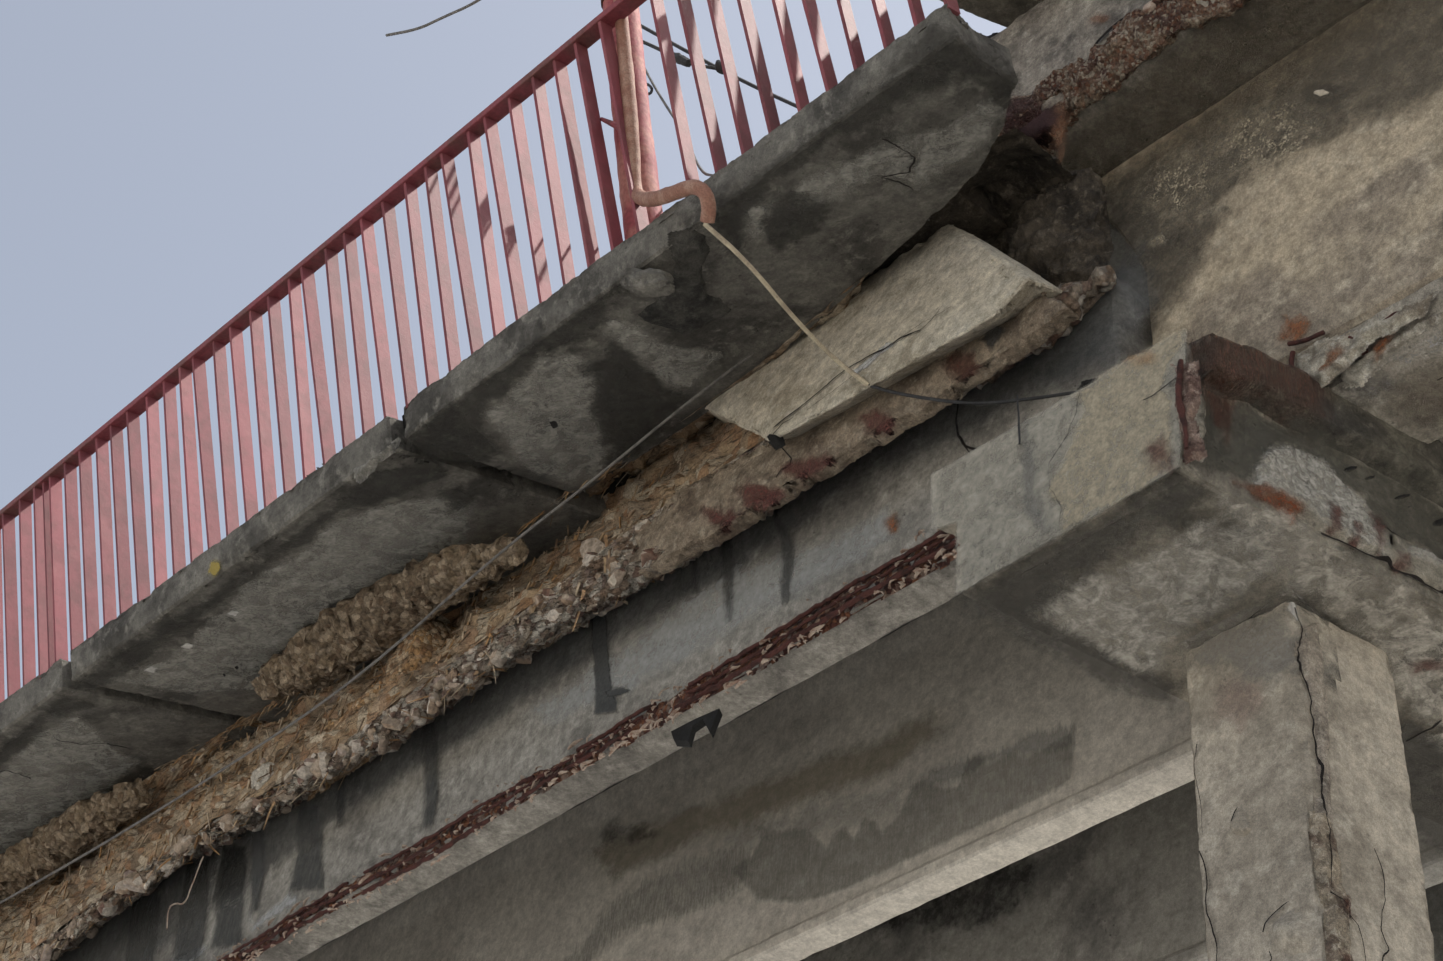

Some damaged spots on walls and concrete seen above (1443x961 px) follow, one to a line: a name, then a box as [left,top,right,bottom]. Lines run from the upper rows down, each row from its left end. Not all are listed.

damp [715,26,1020,253]
spalling [984,167,1114,287]
spalling [998,0,1251,156]
damp [1057,0,1443,316]
corrosion [1190,333,1338,428]
spalling [1287,290,1443,389]
damp [0,275,1144,961]
damp [931,331,1443,850]
corrosion [1249,485,1303,524]
crack [1321,532,1443,594]
corrosion [213,528,960,961]
crack [1294,607,1390,961]